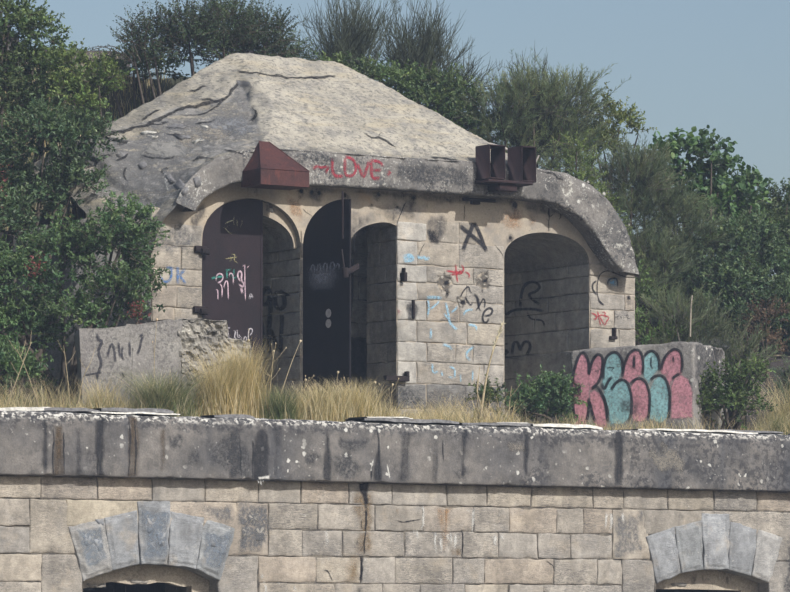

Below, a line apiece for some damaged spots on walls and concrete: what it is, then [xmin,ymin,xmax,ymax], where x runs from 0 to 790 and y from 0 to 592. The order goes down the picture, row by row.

crack [95,71,335,145]
water stain [252,428,277,482]